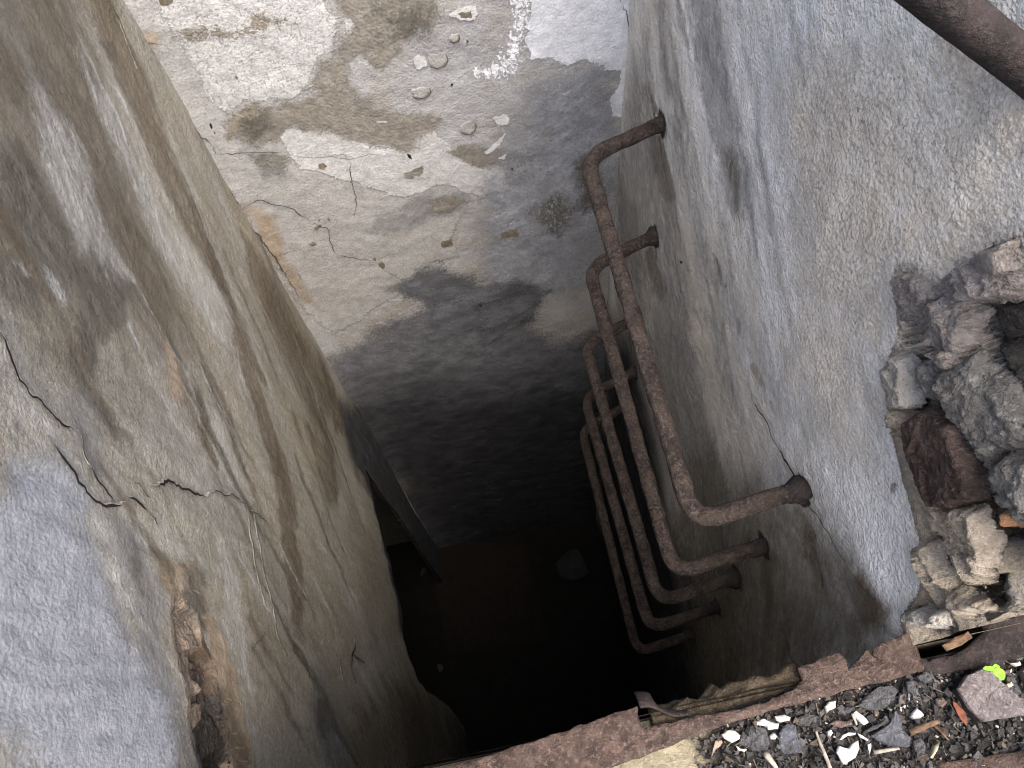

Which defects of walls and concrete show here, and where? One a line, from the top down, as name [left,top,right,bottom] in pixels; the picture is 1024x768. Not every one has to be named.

peeling [123,0,535,335]
peeling [525,0,630,117]
corrosion [650,134,674,201]
crack [0,330,287,659]
water stain [0,0,469,768]
water stain [242,72,886,731]
spalling [879,231,1024,652]
spalling [170,591,231,768]